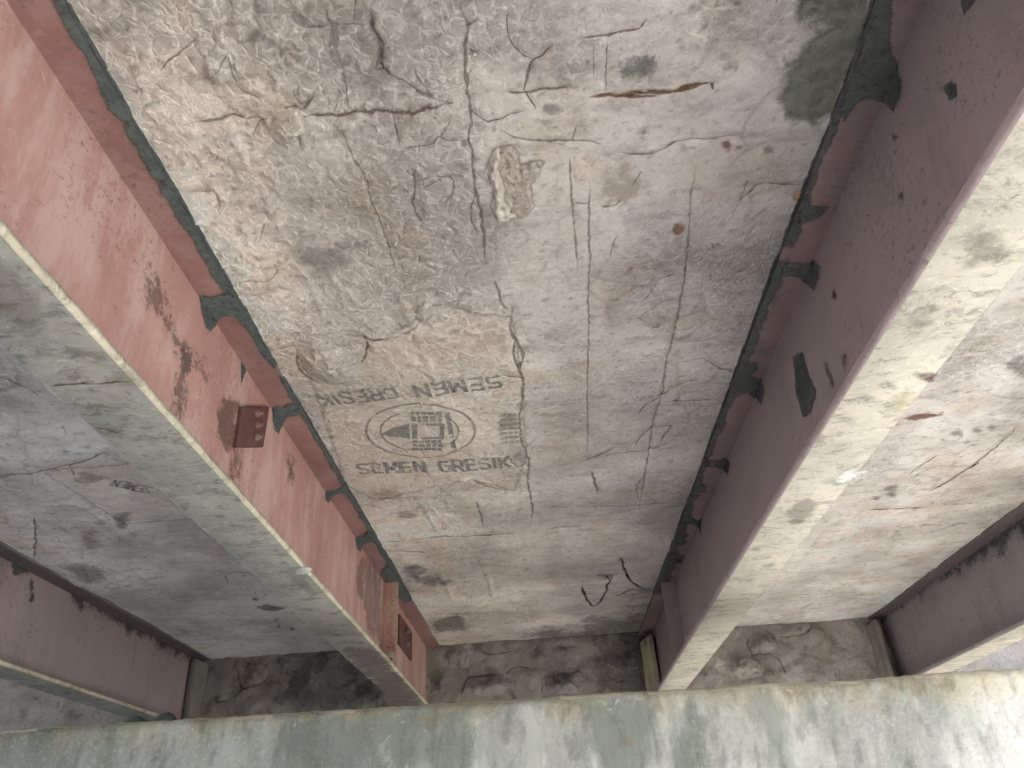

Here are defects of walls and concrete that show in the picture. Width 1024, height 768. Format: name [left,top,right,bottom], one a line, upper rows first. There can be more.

mould [621,55,655,79]
peeling [840,0,901,122]
spalling [485,146,545,223]
corrosion [144,264,208,420]
peeling [200,293,250,332]
crack [202,0,730,553]
leakage [653,0,879,595]
corrosion [217,399,243,478]
peeling [272,403,301,433]
peeling [793,353,816,417]
crack [870,430,1014,530]
crack [581,558,647,606]